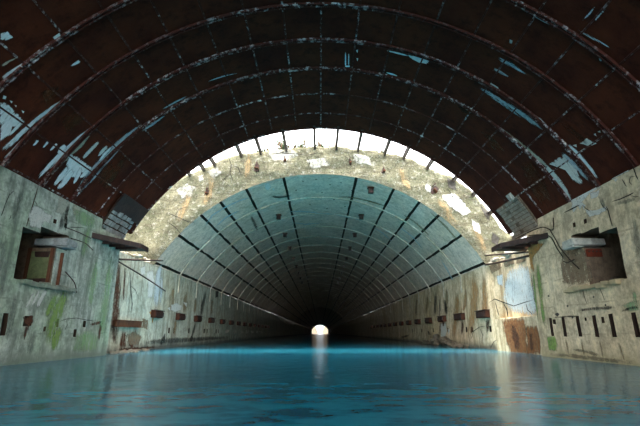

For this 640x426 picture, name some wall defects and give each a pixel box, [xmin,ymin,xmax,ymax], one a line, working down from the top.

peeling [0,95,61,157]
peeling [483,83,544,130]
peeling [33,128,137,188]
peeling [268,150,298,161]
peeling [307,158,329,168]
peeling [503,129,606,216]
spalling [442,178,481,234]
peeling [489,258,536,315]
leakage [26,290,67,350]
corrosion [502,318,541,354]